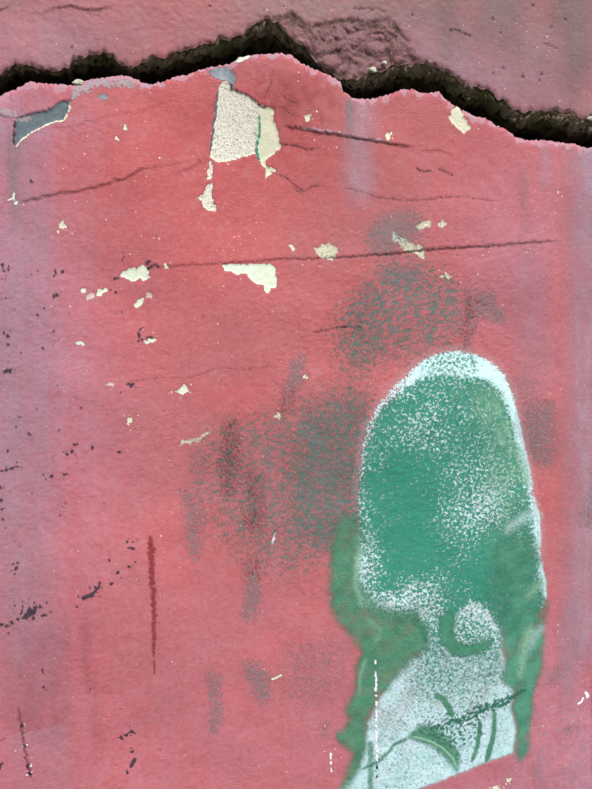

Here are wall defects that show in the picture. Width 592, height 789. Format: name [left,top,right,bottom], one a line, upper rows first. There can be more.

crack [0,18,592,154]
peeling [13,101,71,147]
peeling [198,67,281,211]
peeling [449,106,471,134]
peeling [314,242,338,261]
crack [318,241,549,258]
peeling [120,265,150,281]
peeling [222,263,277,293]